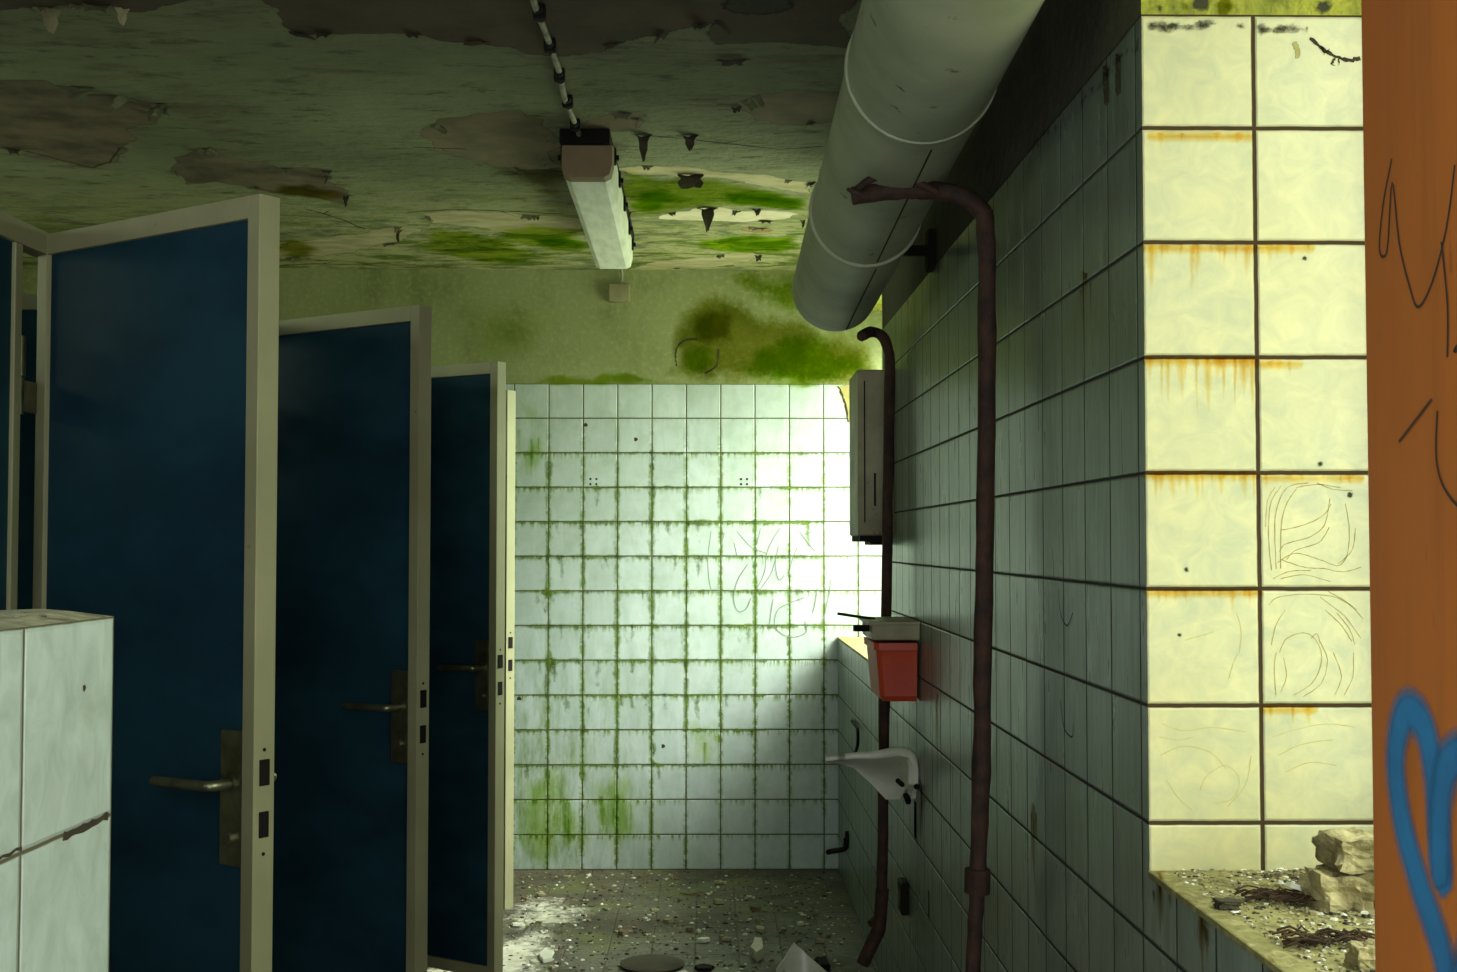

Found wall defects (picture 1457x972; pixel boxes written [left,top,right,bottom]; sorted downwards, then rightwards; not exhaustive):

peeling [0,80,171,168]
peeling [171,147,353,207]
peeling [585,112,816,194]
peeling [279,211,583,261]
peeling [634,252,765,270]
peeling [659,207,806,233]